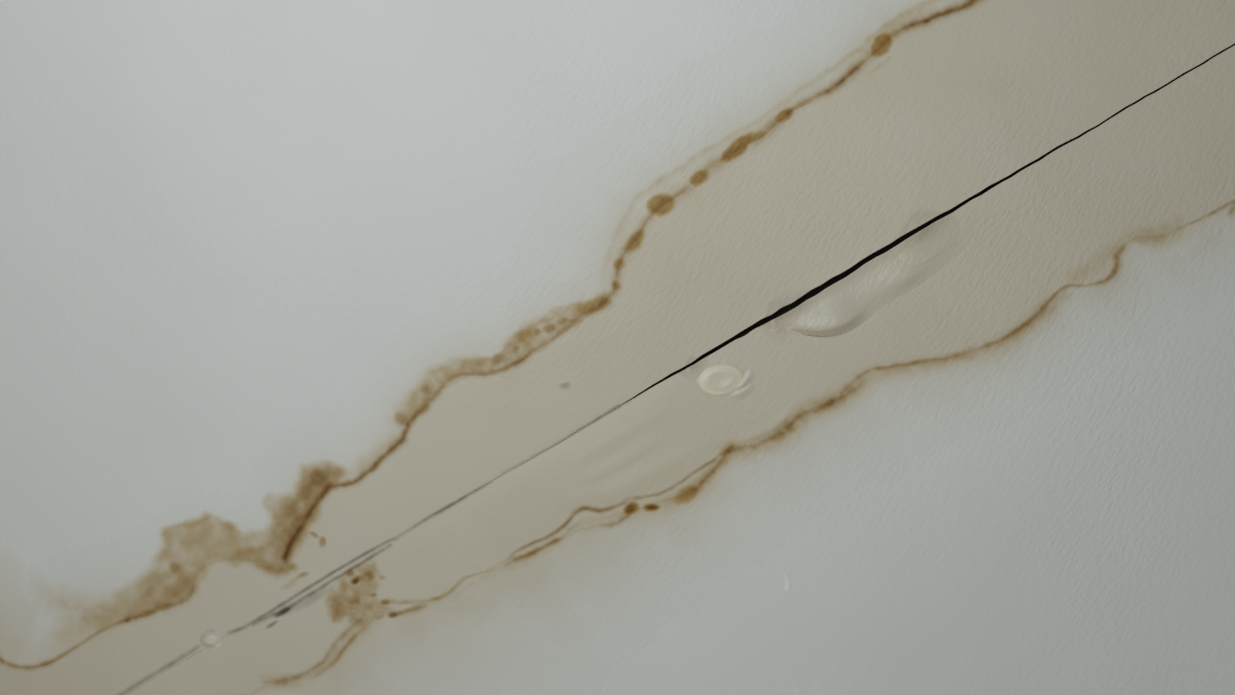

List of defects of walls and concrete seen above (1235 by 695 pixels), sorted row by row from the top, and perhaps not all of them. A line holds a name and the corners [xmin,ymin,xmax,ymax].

water stain [600,0,995,303]
water stain [0,539,42,662]
water stain [0,644,88,673]
crack [112,643,202,695]
water stain [18,0,919,663]
water stain [131,213,1235,695]
crack [226,44,1235,636]